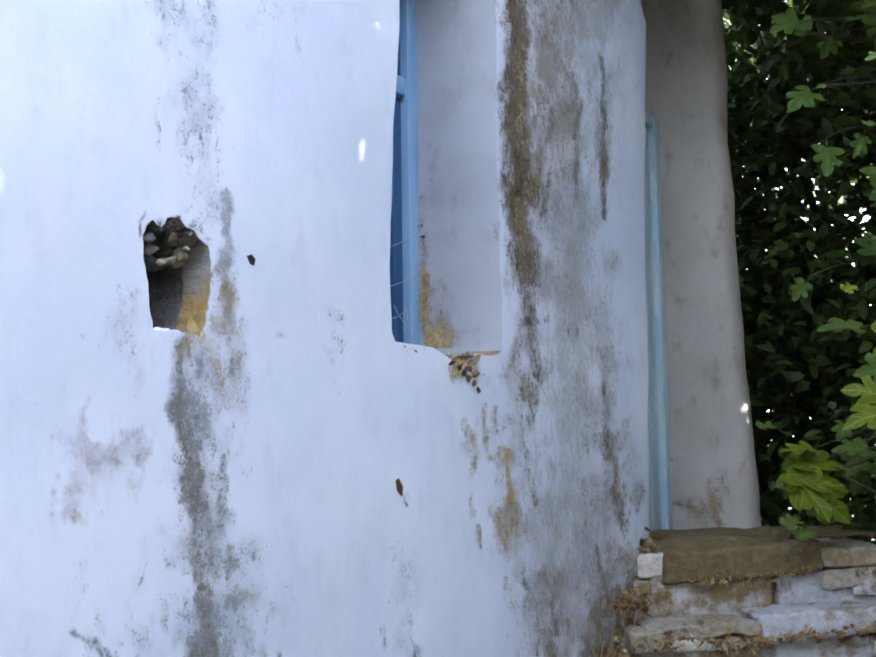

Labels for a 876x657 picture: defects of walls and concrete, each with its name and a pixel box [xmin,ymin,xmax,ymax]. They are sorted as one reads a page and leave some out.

water stain [597,57,611,220]
spalling [143,206,210,272]
flaking render [153,299,209,343]
peeling [404,213,454,352]
water stain [461,0,591,532]
water stain [165,175,260,657]
water stain [576,340,644,538]
water stain [511,564,571,657]
water stain [581,543,639,657]